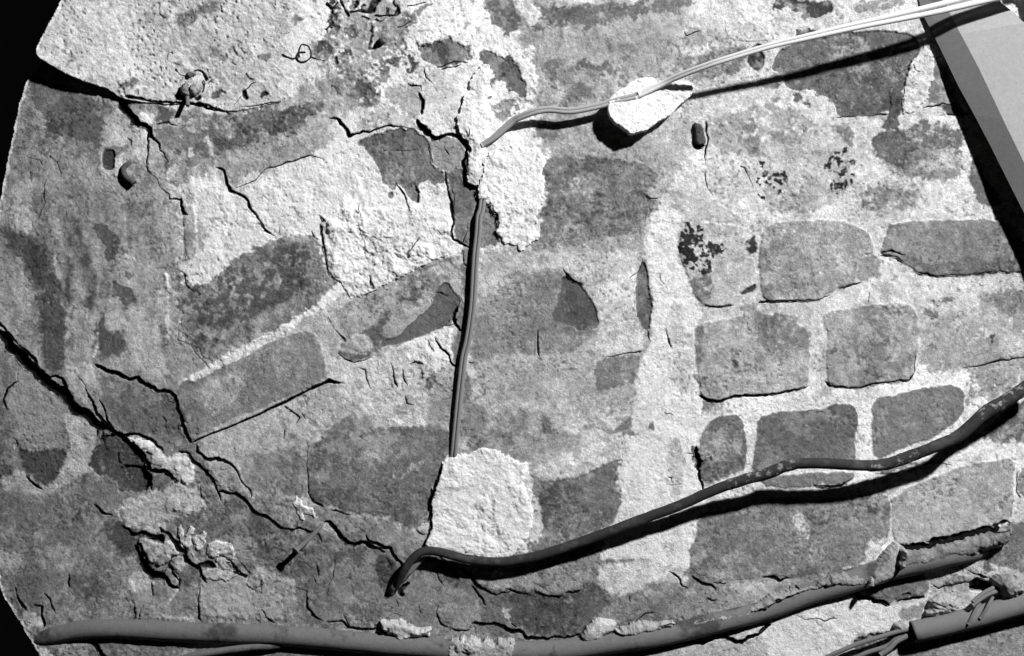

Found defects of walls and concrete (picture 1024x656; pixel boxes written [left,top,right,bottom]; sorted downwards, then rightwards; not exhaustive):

spalling [340,0,381,17]
peeling [177,71,202,101]
crack [118,95,280,292]
crack [217,155,339,282]
crack [330,61,500,268]
spalling [88,432,153,492]
crack [0,292,582,640]
peeling [138,524,265,590]